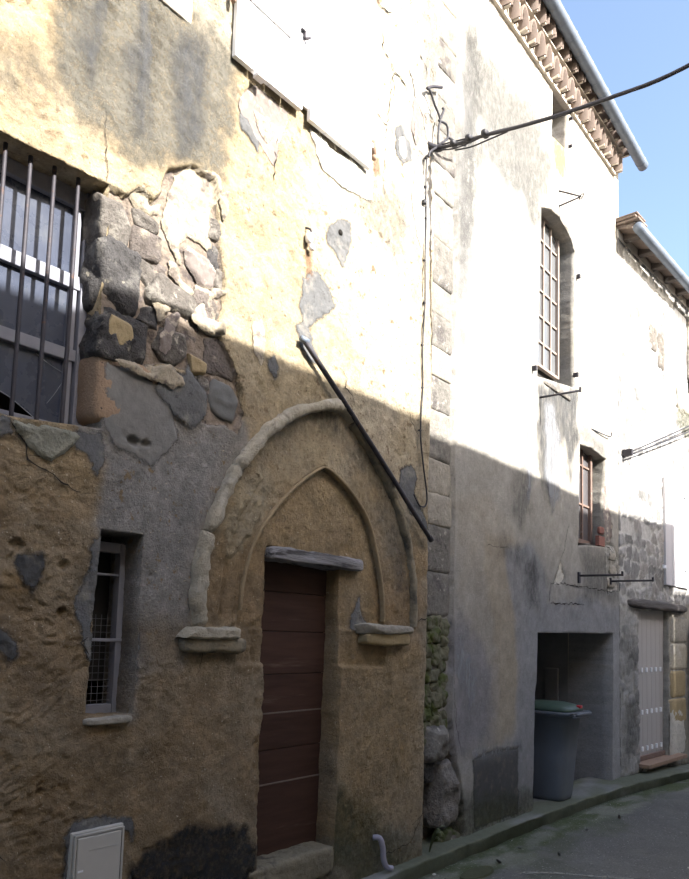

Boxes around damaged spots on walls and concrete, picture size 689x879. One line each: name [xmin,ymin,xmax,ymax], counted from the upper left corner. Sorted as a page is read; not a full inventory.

water stain [53,0,235,177]
flaking render [239,86,289,166]
flaking render [12,166,244,462]
water stain [527,386,578,502]
water stain [128,824,258,879]